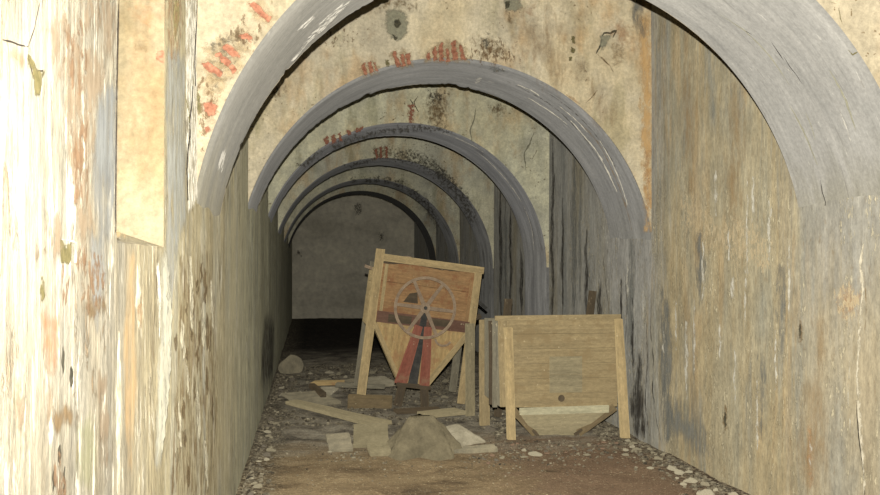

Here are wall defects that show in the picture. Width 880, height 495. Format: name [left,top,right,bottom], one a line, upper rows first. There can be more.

crack [3,3,40,47]
flaking render [291,2,349,61]
flaking render [362,51,411,75]
flaking render [386,1,408,40]
flaking render [425,40,466,62]
peeling [596,30,622,71]
peeling [168,0,272,213]
flaking render [298,125,534,250]
water stain [744,177,754,320]
water stain [620,234,706,450]